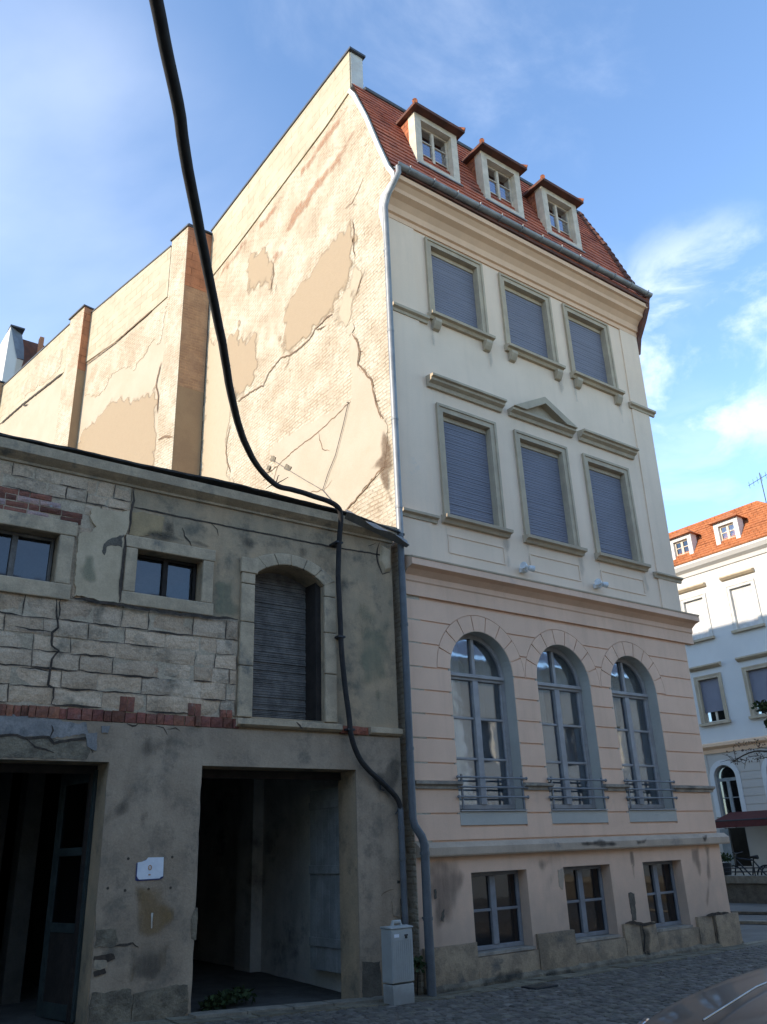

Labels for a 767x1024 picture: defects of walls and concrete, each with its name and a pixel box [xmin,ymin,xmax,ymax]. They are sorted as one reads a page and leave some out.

crack [345,182,364,296]
crack [237,314,332,402]
crack [267,334,383,478]
flaking render [0,486,130,606]
crack [345,469,381,511]
crack [0,489,389,753]
peeling [0,714,111,760]